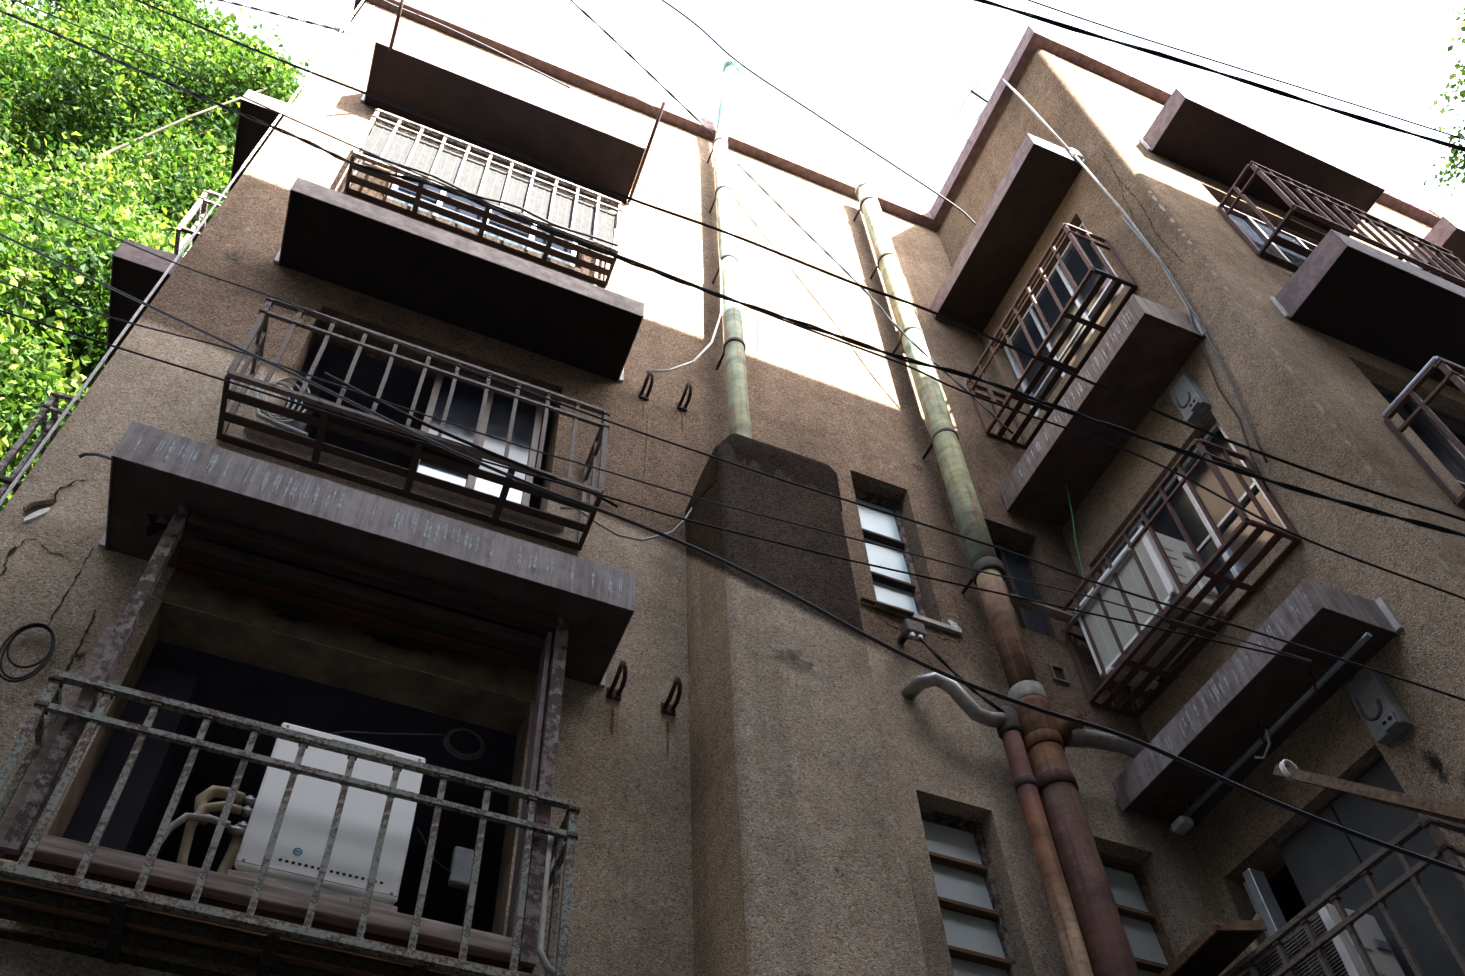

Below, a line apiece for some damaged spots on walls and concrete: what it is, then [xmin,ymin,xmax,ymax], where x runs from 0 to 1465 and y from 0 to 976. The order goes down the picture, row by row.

crack [0,539,98,672]